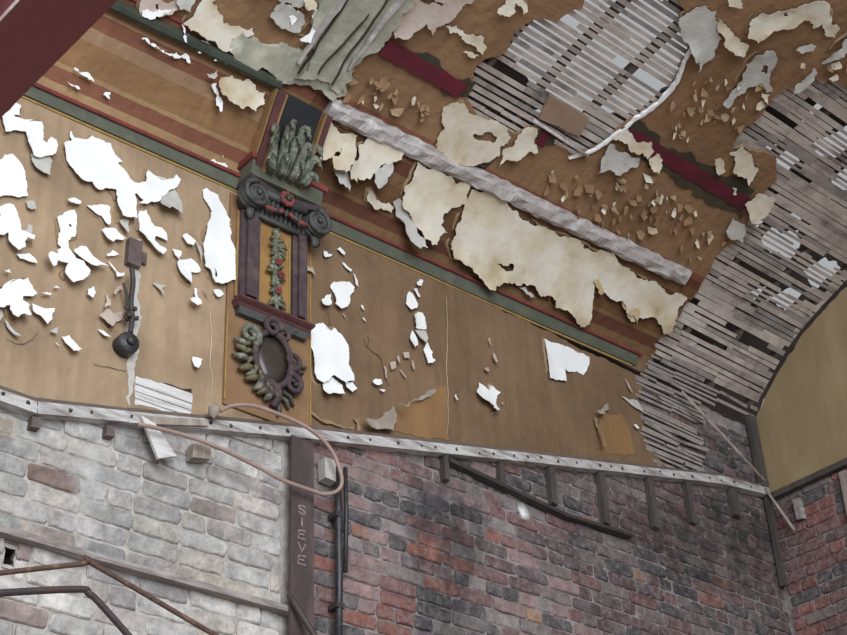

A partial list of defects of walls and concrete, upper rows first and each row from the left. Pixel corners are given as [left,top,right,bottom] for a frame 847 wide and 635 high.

peeling [136,0,254,54]
peeling [270,0,318,43]
peeling [207,71,266,112]
peeling [672,0,847,143]
peeling [436,100,538,166]
peeling [0,103,236,351]
peeling [320,123,687,335]
peeling [544,129,776,261]
peeling [311,323,357,394]
peeling [373,279,435,392]
peeling [542,338,590,383]
peeling [477,382,504,415]